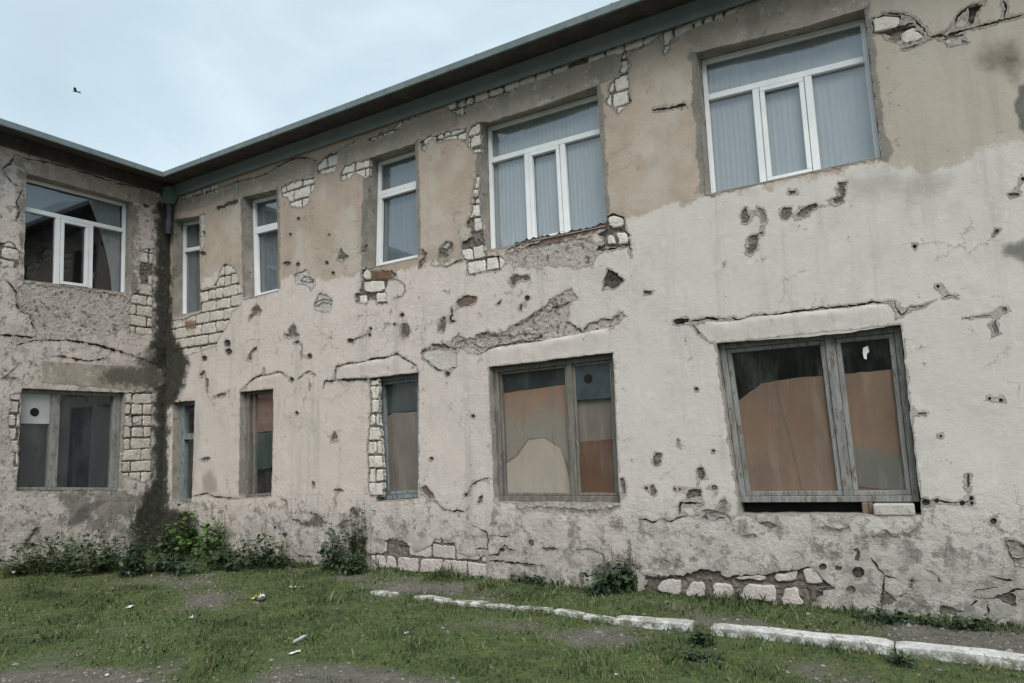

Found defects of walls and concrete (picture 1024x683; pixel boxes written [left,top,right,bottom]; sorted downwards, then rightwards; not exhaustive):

flaking render [281,0,754,220]
flaking render [418,174,631,289]
crack [0,282,157,365]
water stain [105,365,166,387]
flaking render [171,264,262,398]
crack [244,330,417,388]
flaking render [355,267,396,304]
spalling [421,289,625,376]
crack [673,295,991,338]
flaking render [367,378,386,498]
flaking render [370,538,487,578]
flaking render [642,521,922,607]